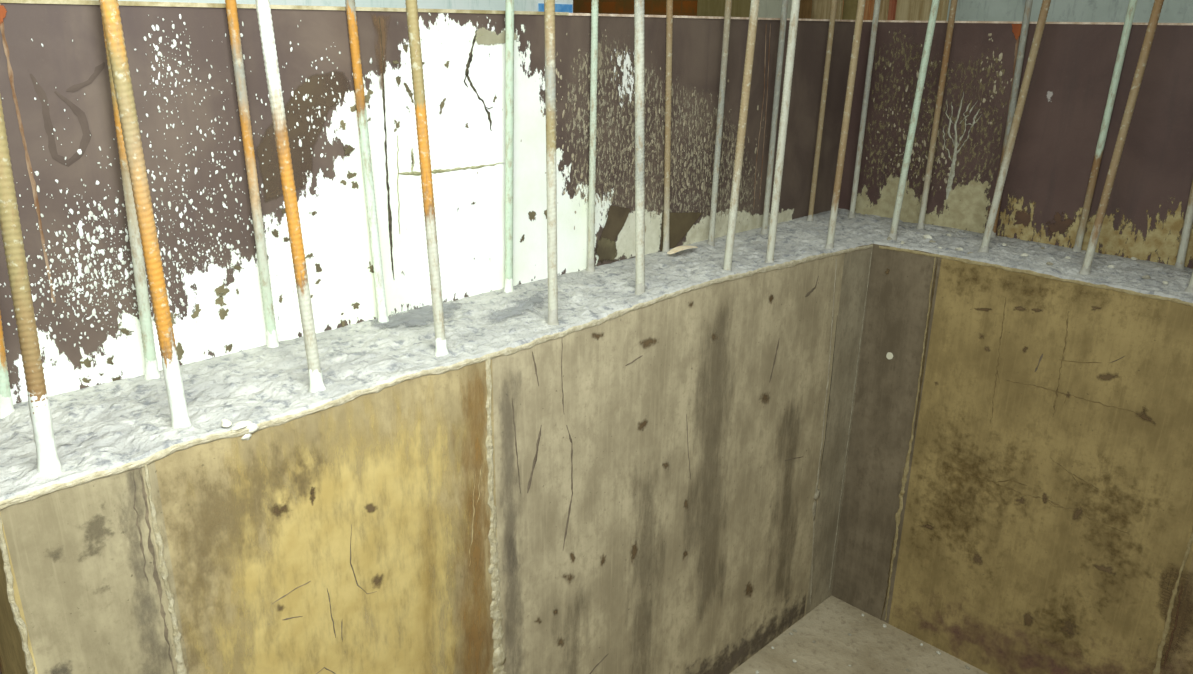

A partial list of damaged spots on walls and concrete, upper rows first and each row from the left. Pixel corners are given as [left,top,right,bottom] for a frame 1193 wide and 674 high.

corrosion [0,3,56,303]
peeling [0,0,800,475]
crack [379,18,499,279]
spalling [807,0,837,221]
peeling [825,0,1193,293]
leakage [698,598,806,674]
leakage [1160,569,1193,666]